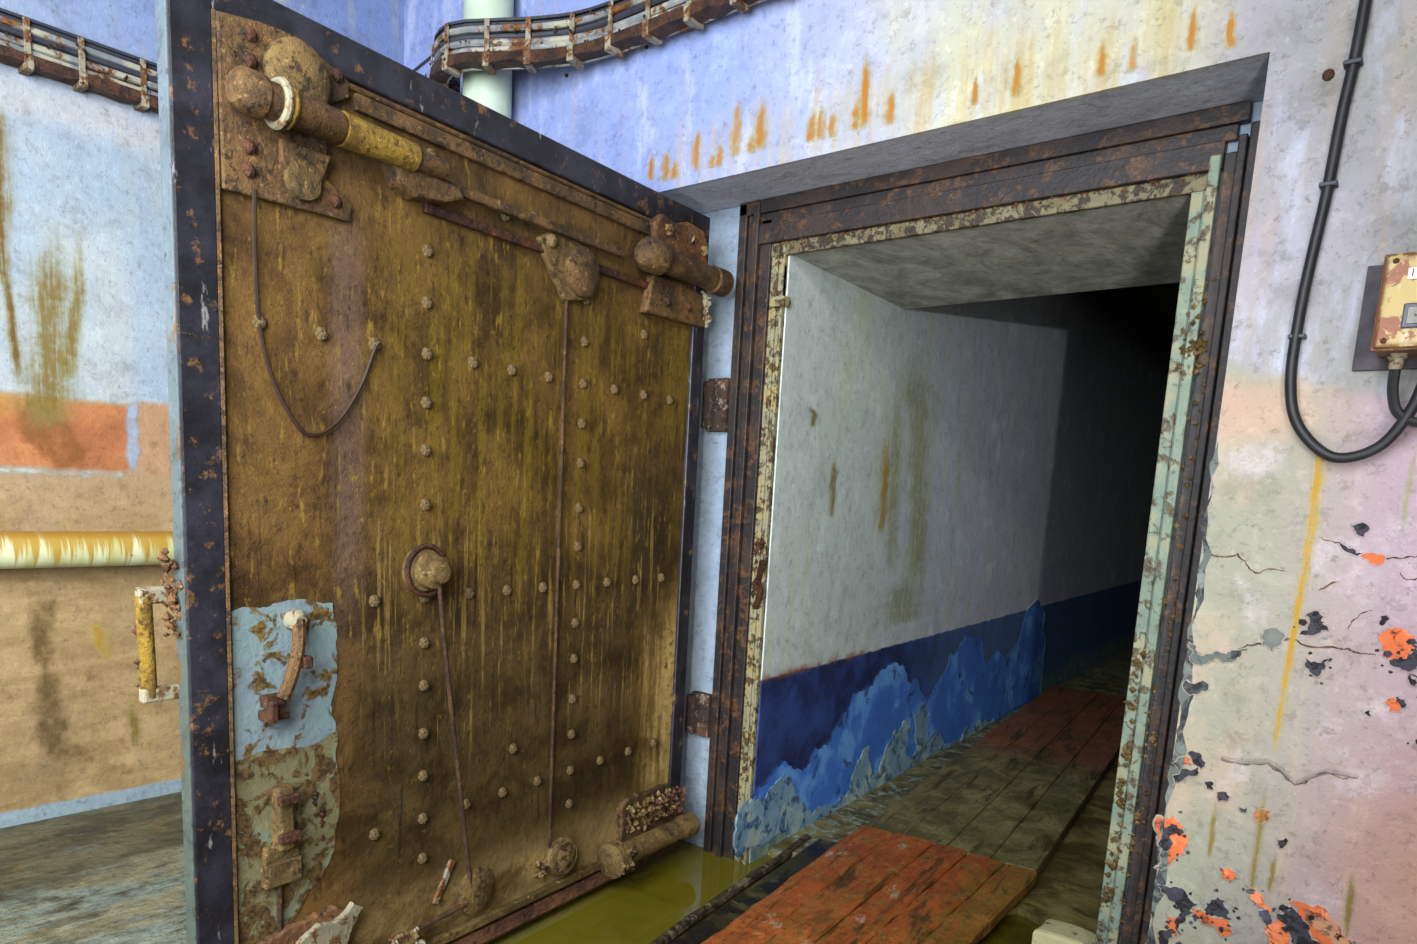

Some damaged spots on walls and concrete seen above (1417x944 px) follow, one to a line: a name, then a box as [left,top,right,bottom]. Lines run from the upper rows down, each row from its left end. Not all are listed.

rust [852,63,894,129]
rust [648,104,767,181]
rust [0,116,20,371]
rust [1174,276,1220,488]
crack [1211,553,1285,574]
peeling [1337,520,1388,568]
crack [1321,537,1417,581]
peeling [1145,442,1357,944]
crack [1199,610,1376,655]
peeling [1362,616,1417,718]
rust [1102,650,1166,937]
crack [1222,755,1359,786]